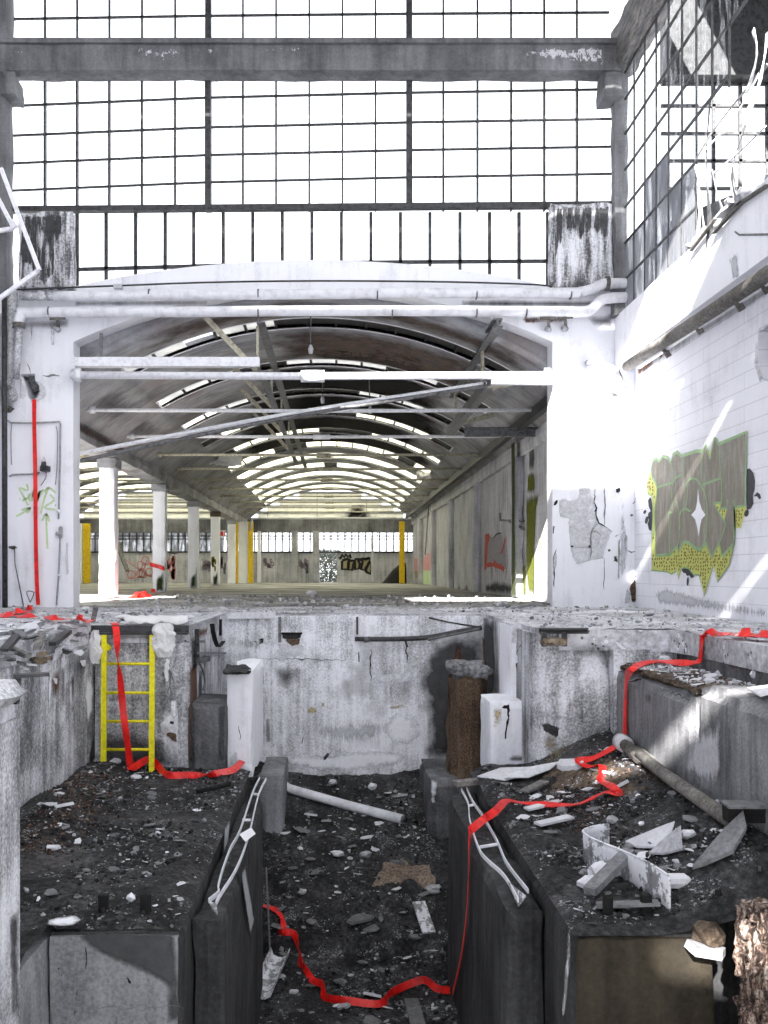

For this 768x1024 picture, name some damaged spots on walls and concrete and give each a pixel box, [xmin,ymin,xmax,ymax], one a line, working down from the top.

peeling [527,47,603,65]
leakage [20,214,63,281]
leakage [553,207,609,270]
flaking render [559,477,618,564]
crack [553,477,635,588]
leakage [423,624,494,756]